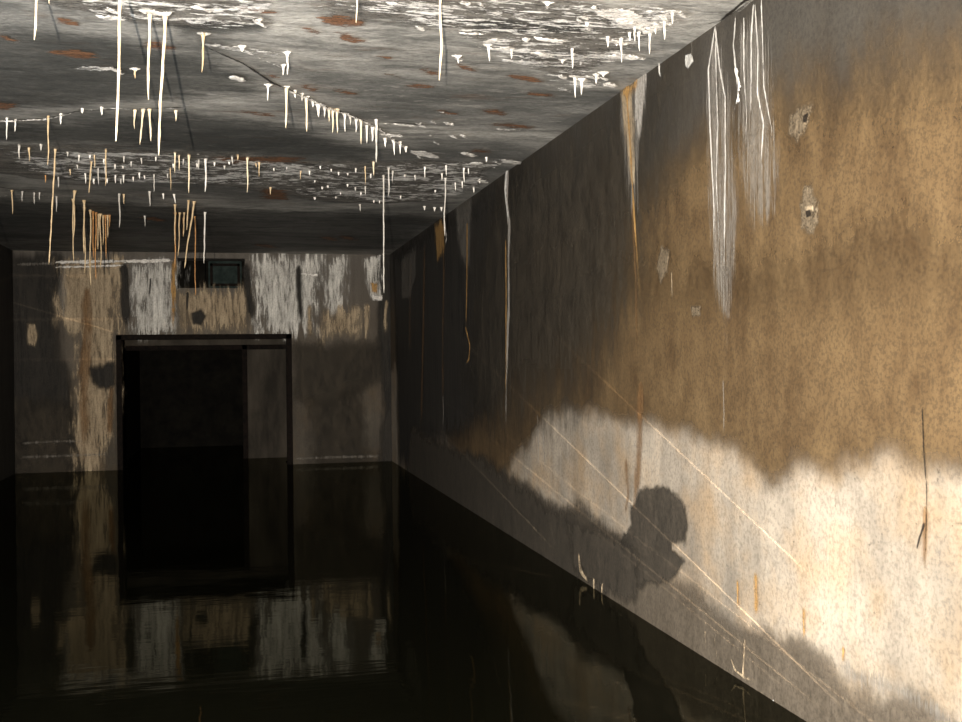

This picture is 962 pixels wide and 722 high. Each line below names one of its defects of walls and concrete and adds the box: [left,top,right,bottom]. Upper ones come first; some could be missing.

damp [91,7,181,21]
damp [386,1,485,12]
damp [205,43,277,56]
damp [77,66,124,75]
damp [0,116,368,155]
damp [380,112,466,160]
damp [0,203,427,323]
damp [407,0,962,722]